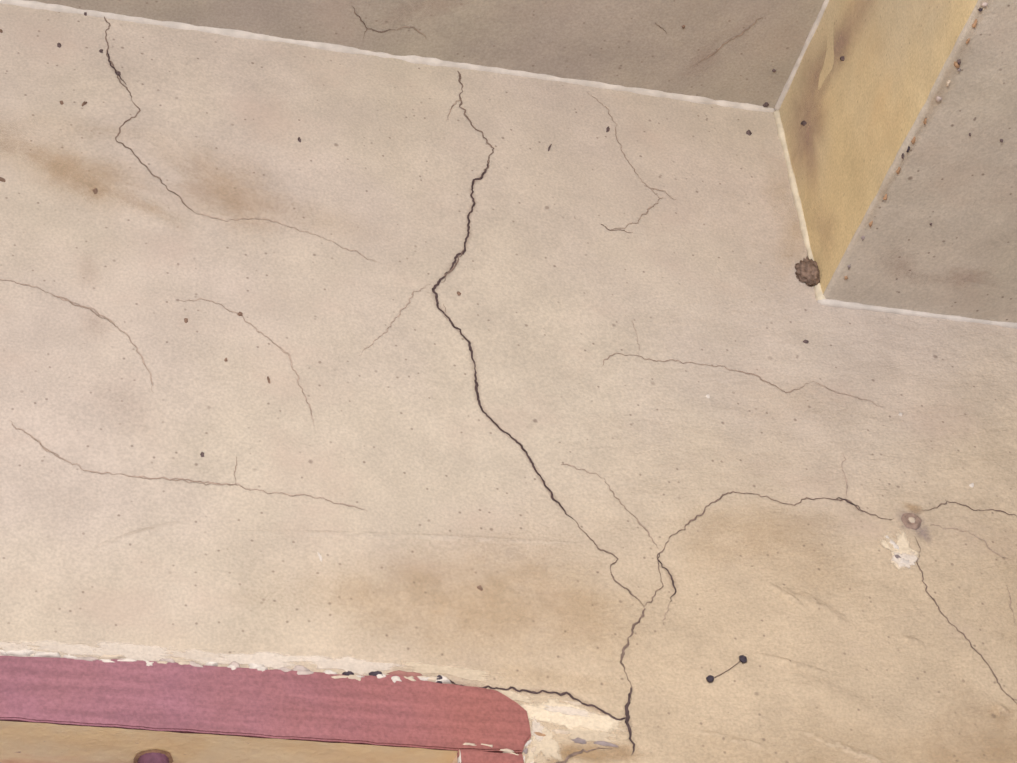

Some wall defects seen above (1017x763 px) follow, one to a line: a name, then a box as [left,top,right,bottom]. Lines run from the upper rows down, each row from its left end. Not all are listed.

crack [104,17,380,263]
crack [0,279,153,392]
crack [11,421,366,510]
crack [179,298,314,425]
crack [359,71,892,763]
flaking render [881,531,920,570]
crack [914,501,1017,704]
flaking render [0,642,487,684]
flaking render [458,690,624,763]